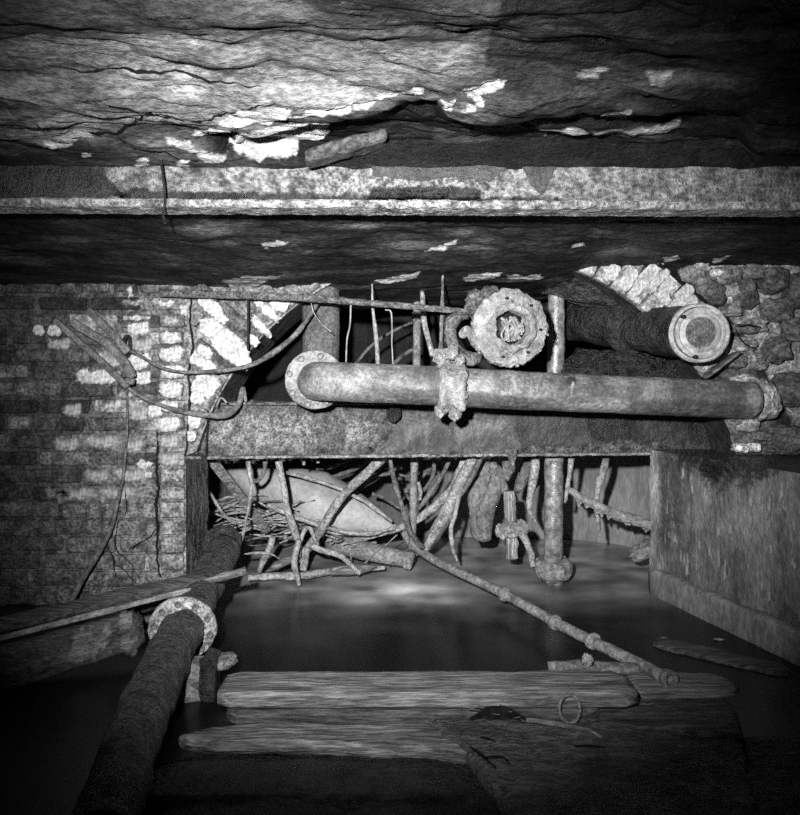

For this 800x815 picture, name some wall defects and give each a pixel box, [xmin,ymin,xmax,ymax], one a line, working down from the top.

crack [49,66,275,162]
leakage [46,468,152,503]
leakage [54,435,146,453]
crack [184,298,194,455]
corrosion [378,367,745,466]